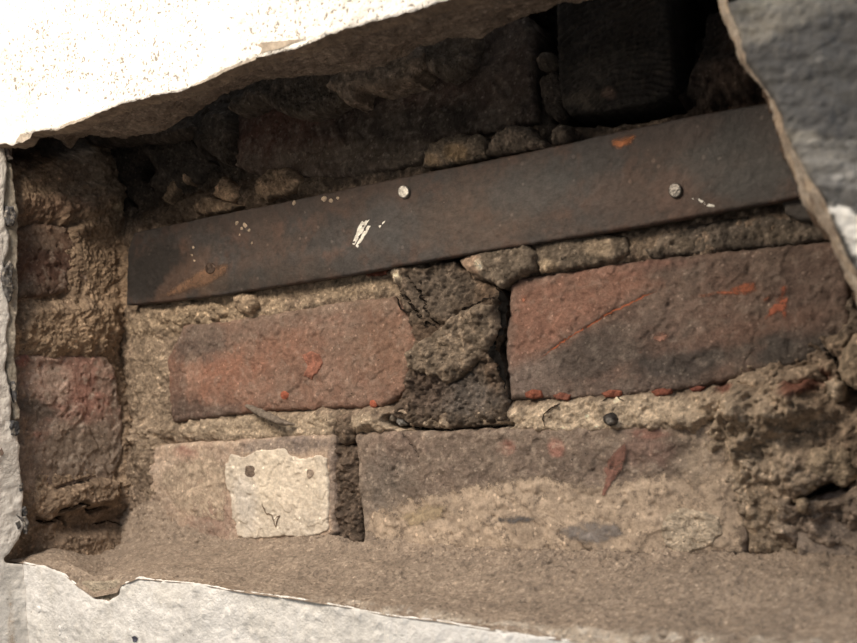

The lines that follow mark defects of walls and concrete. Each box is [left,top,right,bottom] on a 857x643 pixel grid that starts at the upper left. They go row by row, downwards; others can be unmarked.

spalling [194,38,304,86]
rust [613,136,634,147]
spalling [718,0,857,304]
peeling [1,133,32,436]
rust [169,265,227,294]
spalling [525,389,571,401]
spalling [602,390,622,398]
spalling [651,388,673,397]
peeling [225,448,330,539]
peeling [15,506,29,534]
spalling [82,579,122,600]